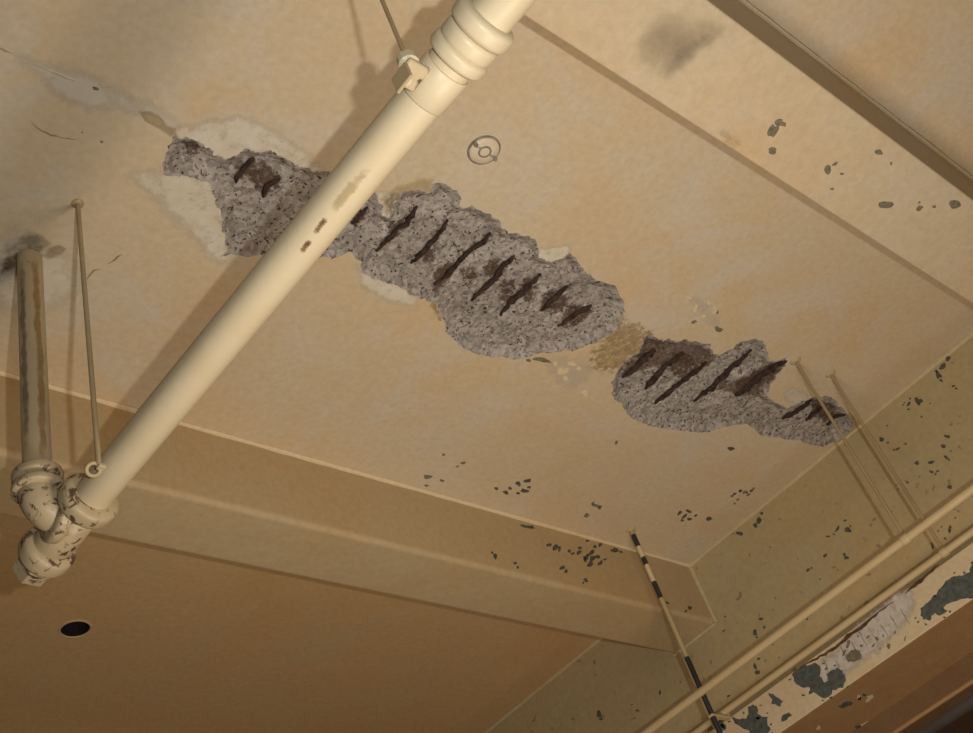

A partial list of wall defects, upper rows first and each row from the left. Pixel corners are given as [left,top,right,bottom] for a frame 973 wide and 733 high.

spalling [142,112,330,257]
damp [0,233,82,309]
spalling [319,183,625,363]
spalling [611,333,853,447]
peeling [915,561,973,626]
peeling [789,631,906,708]
peeling [719,693,792,733]